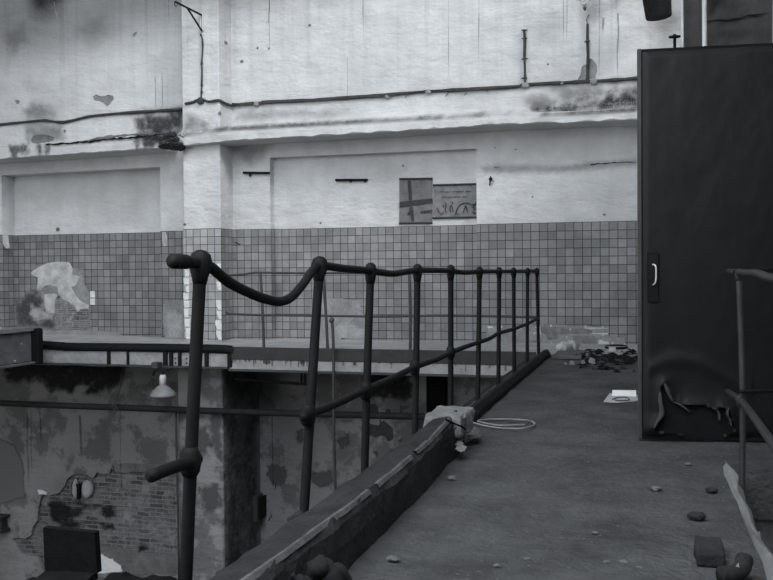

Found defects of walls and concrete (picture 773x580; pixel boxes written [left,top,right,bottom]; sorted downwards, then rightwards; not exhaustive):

flaking render [93,95,114,107]
water stain [599,91,637,109]
water stain [137,111,183,146]
peeling [16,261,122,336]
water stain [4,364,124,394]
flaking render [15,463,178,575]